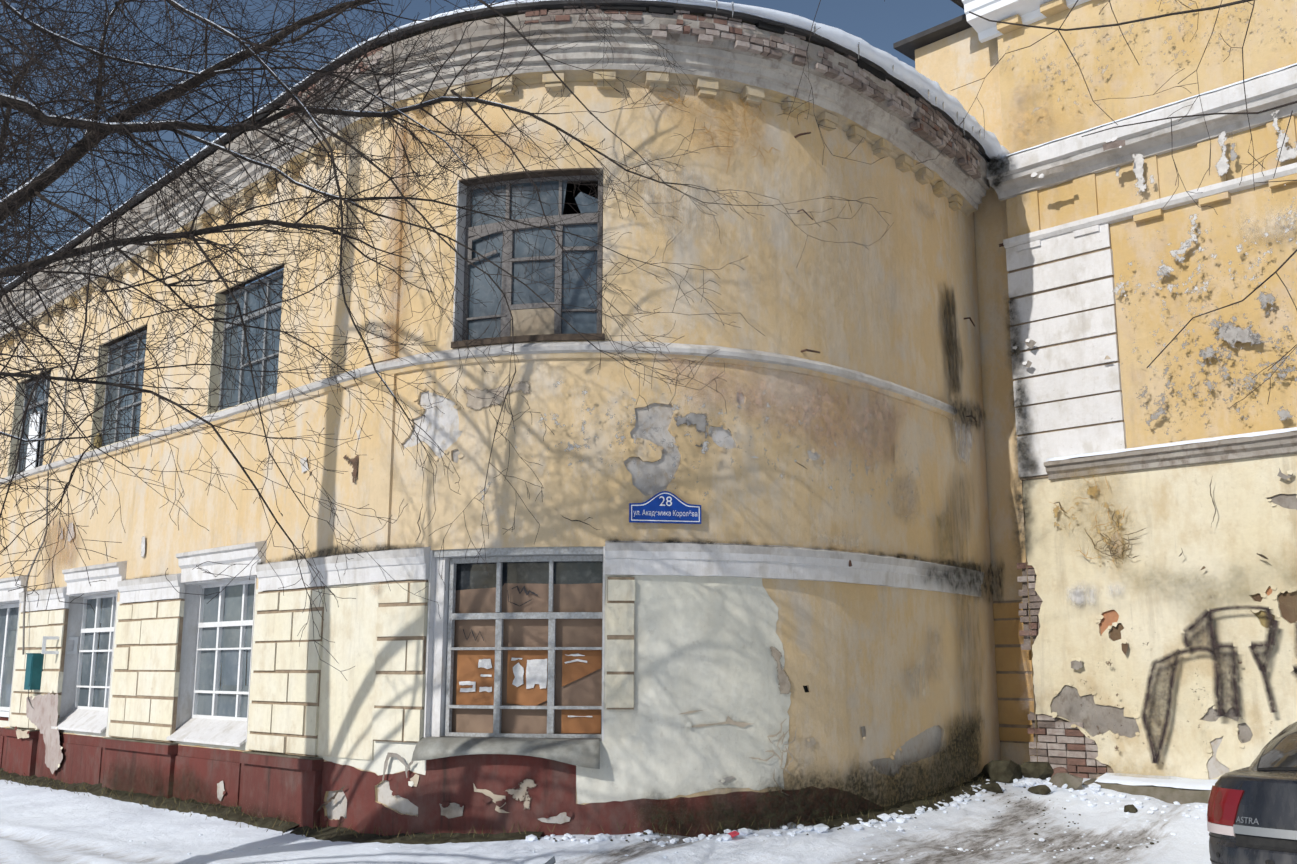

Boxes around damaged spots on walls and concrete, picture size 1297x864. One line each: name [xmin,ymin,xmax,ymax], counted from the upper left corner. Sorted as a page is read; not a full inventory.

peeling [1112,182,1297,435]
leakage [943,288,984,460]
peeling [403,381,530,463]
peeling [495,390,923,506]
leakage [1007,298,1036,556]
spalling [1017,562,1042,650]
spalling [1250,585,1297,628]
peeling [14,690,63,774]
spalling [1027,610,1162,778]
spalling [321,786,347,821]
peeling [377,774,419,815]
peeling [473,778,573,824]